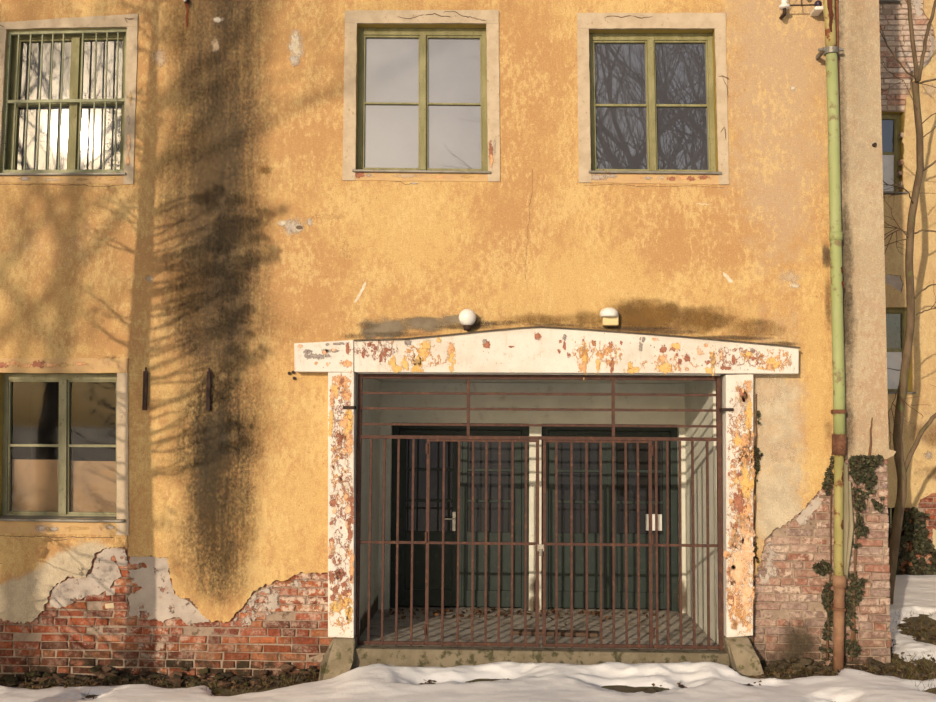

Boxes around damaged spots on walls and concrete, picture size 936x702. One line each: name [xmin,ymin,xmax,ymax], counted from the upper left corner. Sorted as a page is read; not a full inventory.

flaking render [879,0,936,111]
leakage [164,0,269,573]
flaking render [278,214,339,234]
leakage [362,315,494,339]
leakage [529,300,764,339]
flaking render [0,337,456,681]
flaking render [557,334,834,667]
flaking render [844,459,936,667]